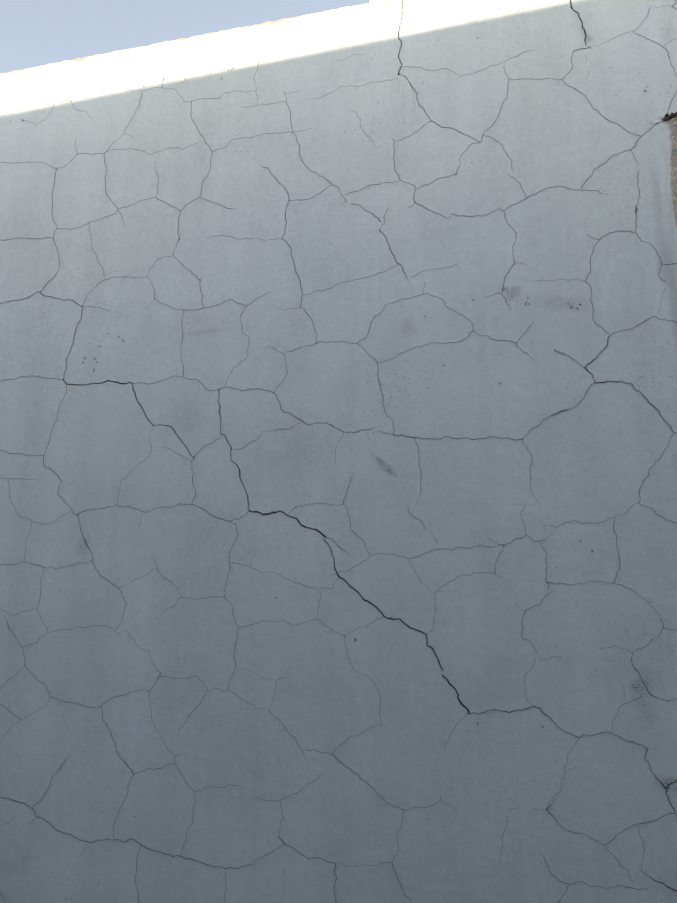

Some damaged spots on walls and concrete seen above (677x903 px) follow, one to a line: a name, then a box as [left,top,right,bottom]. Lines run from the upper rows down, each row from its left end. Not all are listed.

crack [398,1,462,133]
crack [3,281,209,514]
crack [585,336,671,439]
crack [218,388,677,824]
crack [3,762,247,903]